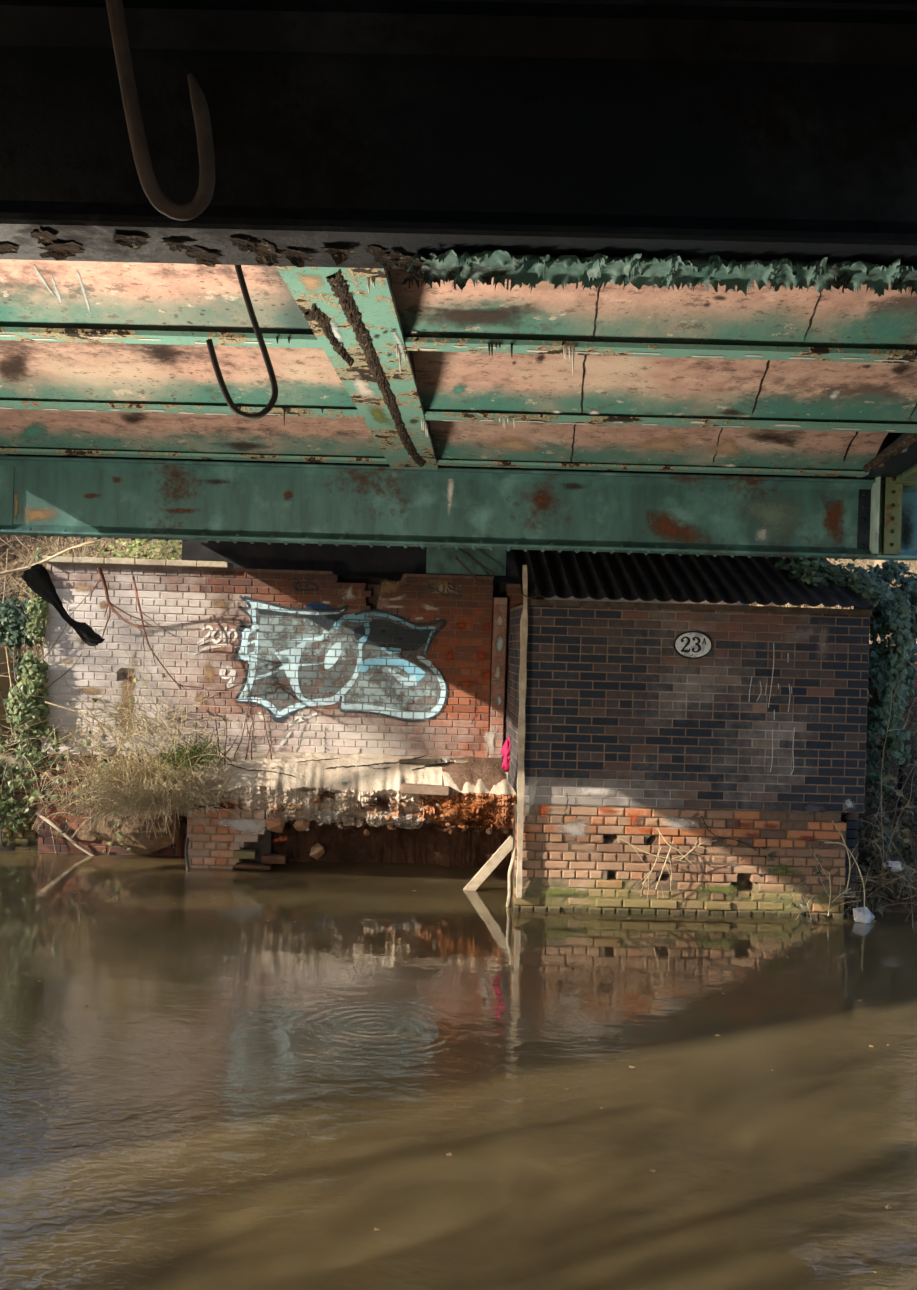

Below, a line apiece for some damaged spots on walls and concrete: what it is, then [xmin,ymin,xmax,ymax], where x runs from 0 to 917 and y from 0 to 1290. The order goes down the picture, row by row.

corrosion [0,244,19,254]
corrosion [30,228,84,260]
corrosion [112,235,222,267]
corrosion [229,238,426,467]
corrosion [651,514,709,543]
corrosion [824,500,843,542]
spalling [358,796,396,809]